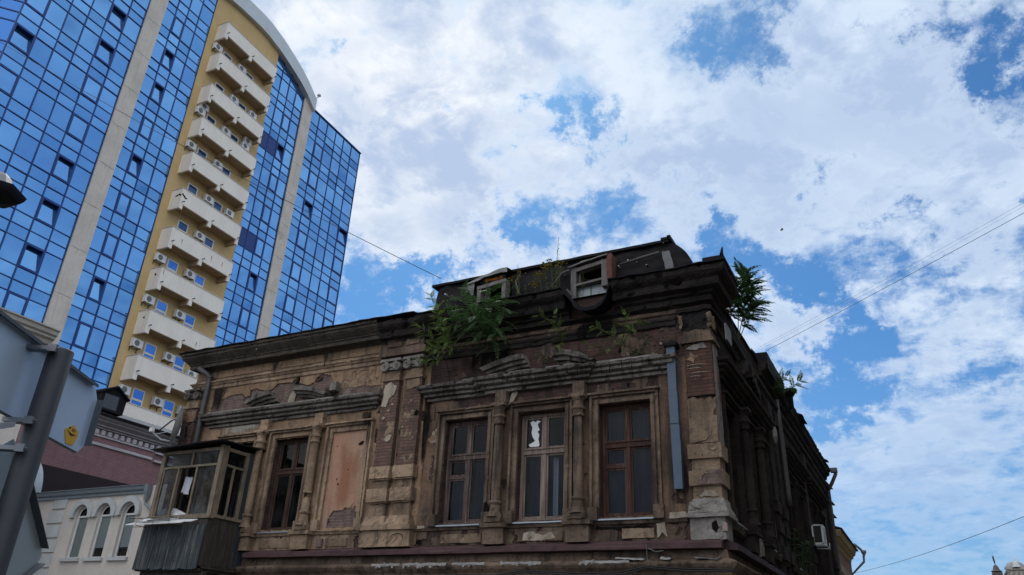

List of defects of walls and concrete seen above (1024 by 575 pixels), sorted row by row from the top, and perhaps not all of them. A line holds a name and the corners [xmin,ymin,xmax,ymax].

peeling [211,374,381,412]
flaking render [327,505,357,529]